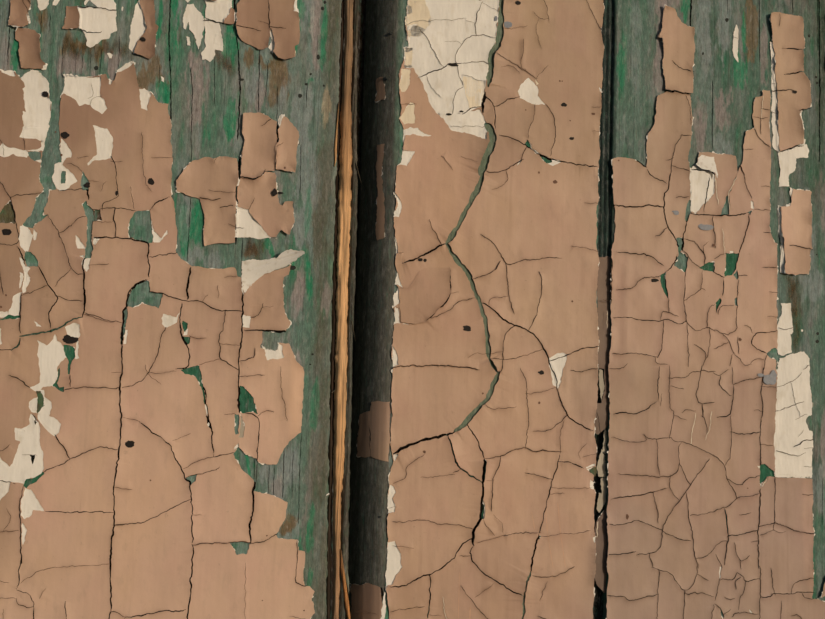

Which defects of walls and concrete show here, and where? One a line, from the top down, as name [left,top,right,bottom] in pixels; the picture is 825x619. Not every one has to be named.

peeling [0,0,158,344]
peeling [175,112,299,246]
peeling [183,0,300,62]
peeling [399,102,432,166]
peeling [399,0,499,139]
peeling [769,12,813,276]
peeling [120,281,190,344]
peeling [241,249,305,296]
crack [392,0,814,619]
peeling [0,323,80,544]
peeling [234,386,258,450]
peeling [758,303,814,486]